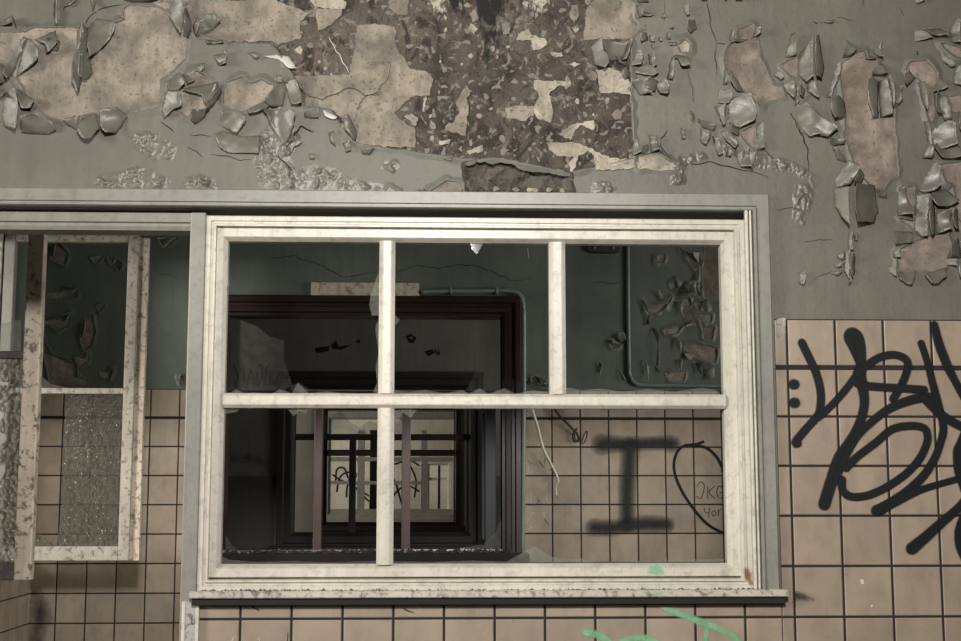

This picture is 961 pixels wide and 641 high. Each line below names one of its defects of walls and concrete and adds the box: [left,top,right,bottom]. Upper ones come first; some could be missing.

flaking render [0,0,697,192]
peeling [696,17,961,285]
peeling [47,243,72,270]
peeling [43,284,117,388]
peeling [636,246,721,384]